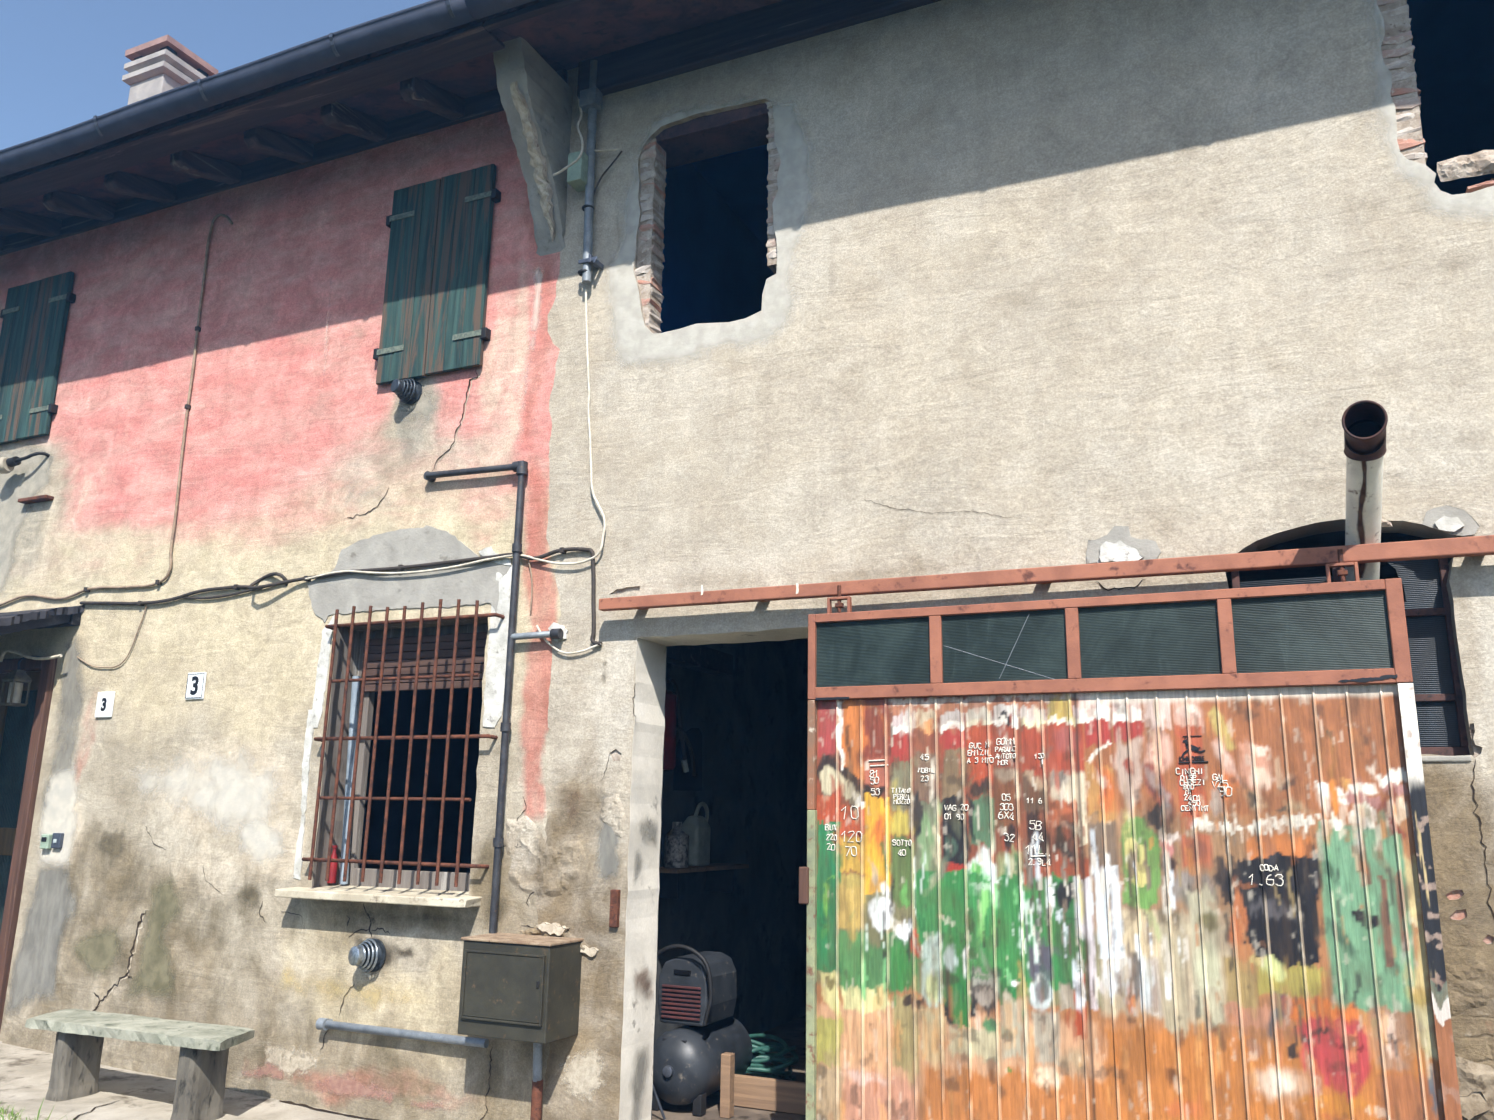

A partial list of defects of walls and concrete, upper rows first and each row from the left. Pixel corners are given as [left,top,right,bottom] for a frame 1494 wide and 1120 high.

crack [432,369,480,471]
water stain [143,760,281,860]
water stain [240,888,259,905]
crack [1471,759,1494,942]
crack [92,909,148,1011]
spalling [1455,1057,1494,1120]